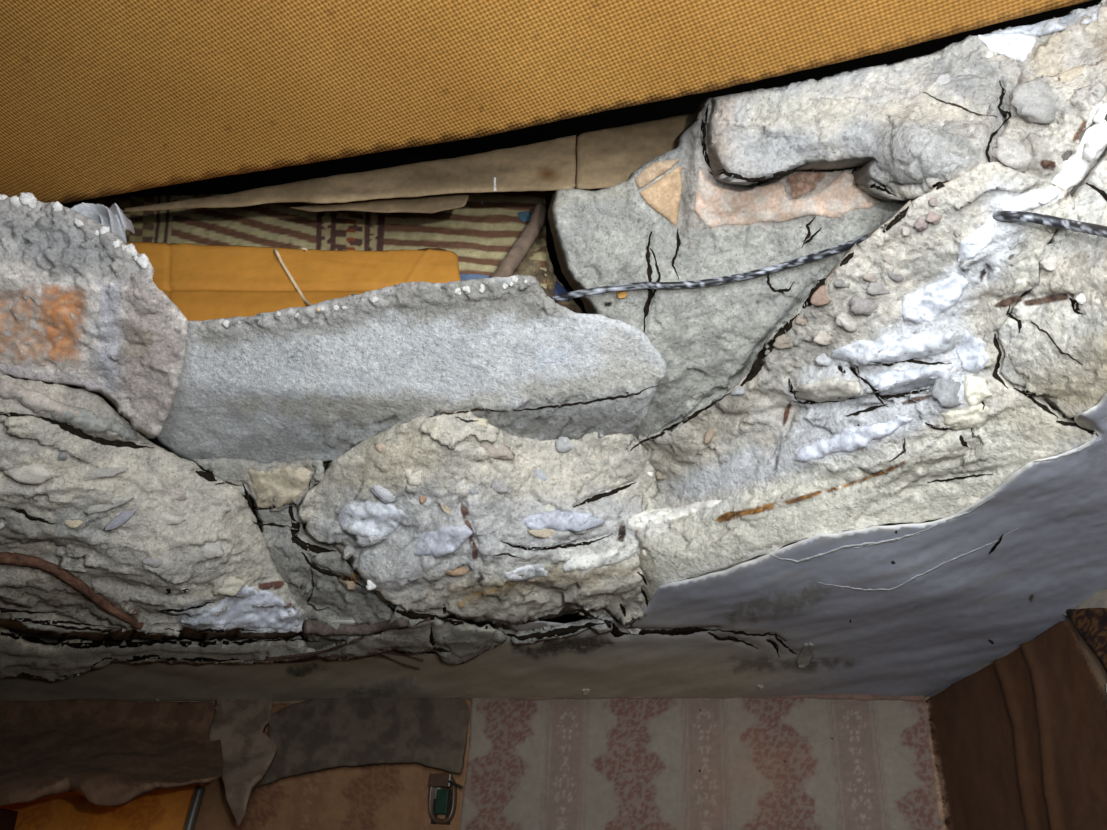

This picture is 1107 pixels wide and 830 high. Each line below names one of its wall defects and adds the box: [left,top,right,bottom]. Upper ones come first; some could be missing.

crack [701,104,909,233]
flaking render [0,288,83,361]
crack [643,229,681,333]
crack [630,252,854,451]
crack [788,359,950,440]
spalling [635,0,1107,602]
crack [889,305,1098,462]
spalling [0,373,722,683]
corrosion [716,462,904,522]
corrosion [0,552,144,629]
crack [379,572,798,657]
peeling [930,735,949,830]